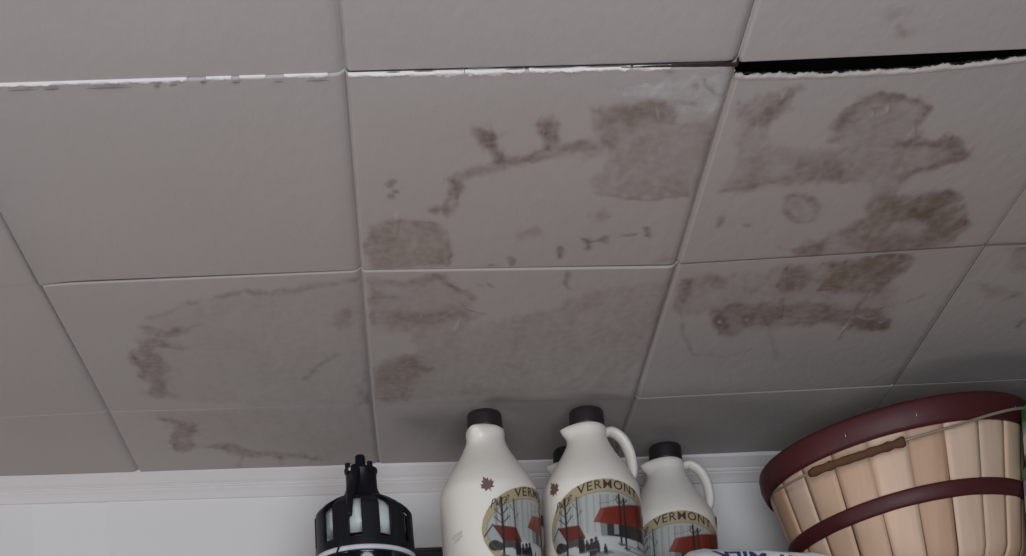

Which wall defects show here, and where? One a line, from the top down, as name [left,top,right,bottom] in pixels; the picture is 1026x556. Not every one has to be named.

peeling [201,73,330,84]